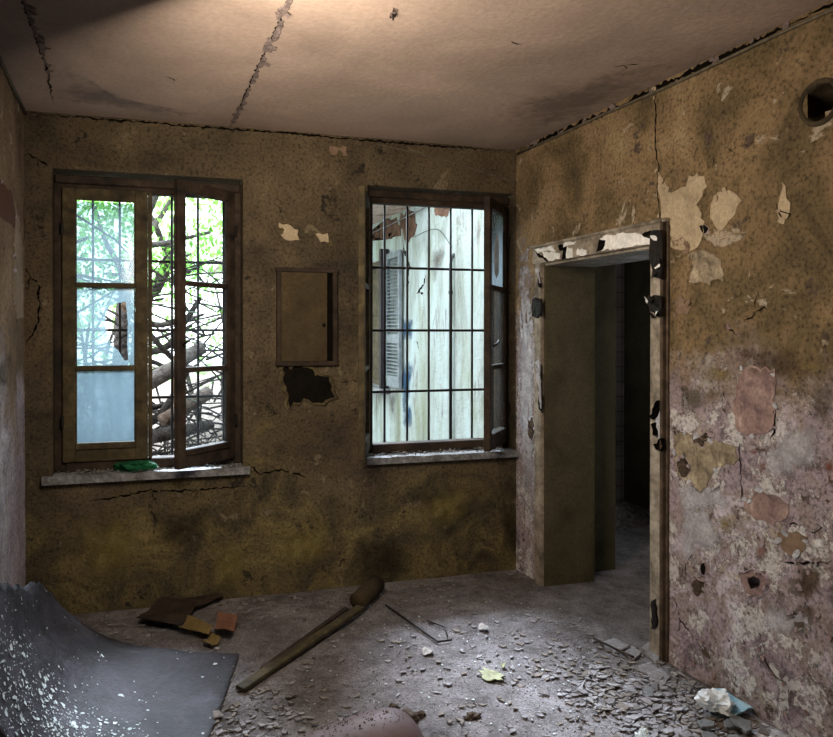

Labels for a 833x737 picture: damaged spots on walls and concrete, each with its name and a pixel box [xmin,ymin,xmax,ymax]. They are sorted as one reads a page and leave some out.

crack [20,0,833,218]
peeling [535,230,657,262]
peeling [657,171,742,285]
peeling [776,182,791,224]
spalling [690,562,707,598]
peeling [739,486,821,638]